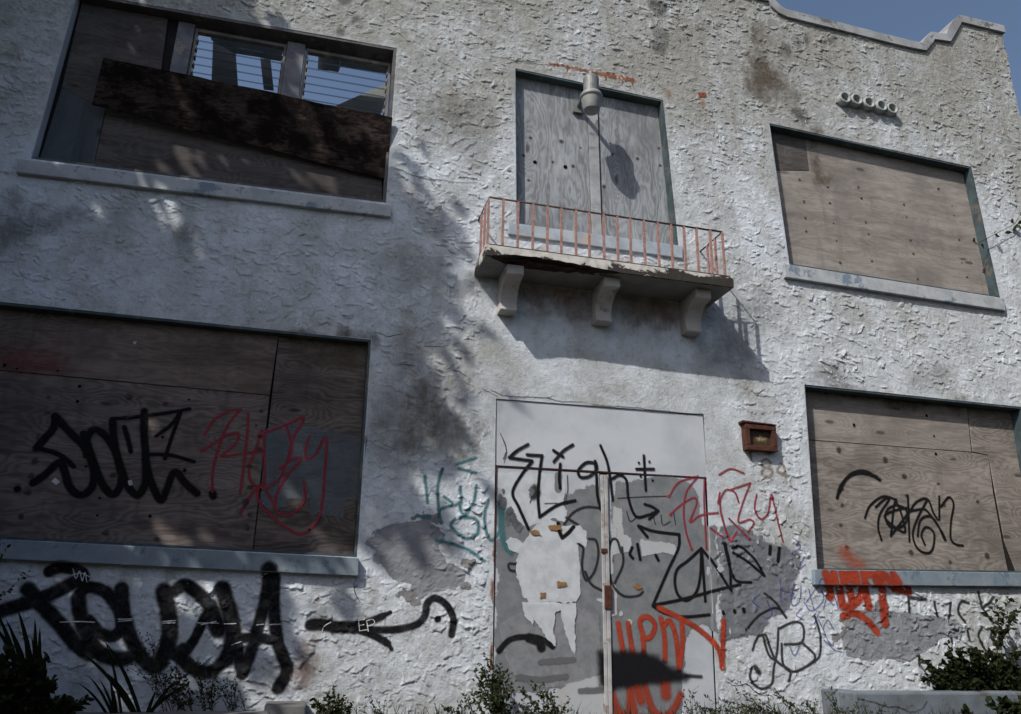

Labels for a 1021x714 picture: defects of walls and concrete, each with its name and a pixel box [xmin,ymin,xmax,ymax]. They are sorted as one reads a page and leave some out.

rust [548,63,635,85]
peeling [365,510,477,606]
peeling [610,527,618,575]
peeling [832,599,963,663]